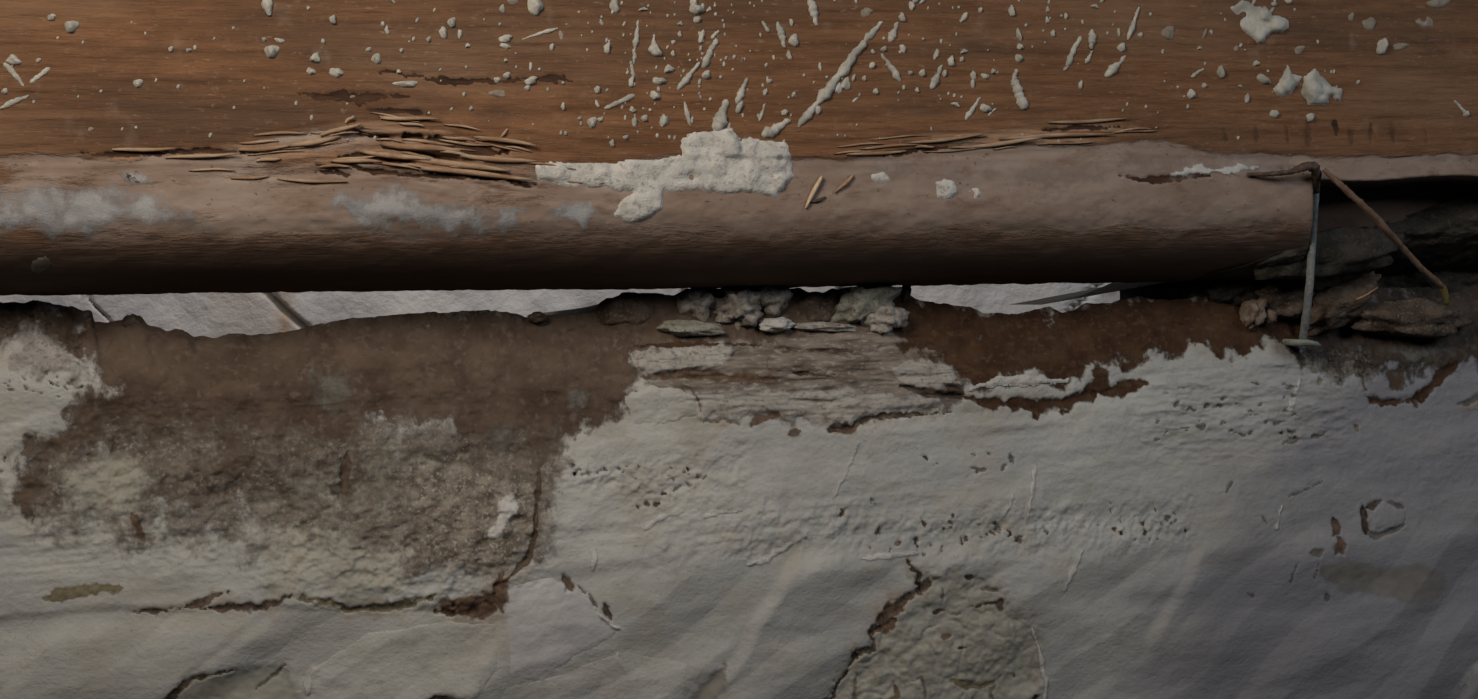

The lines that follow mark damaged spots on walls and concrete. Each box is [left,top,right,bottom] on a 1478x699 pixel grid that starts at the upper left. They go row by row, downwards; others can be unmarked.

spalling [0,286,1478,600]
crack [133,571,506,620]
spalling [562,576,620,629]
spalling [831,514,1041,699]
spalling [176,668,296,699]